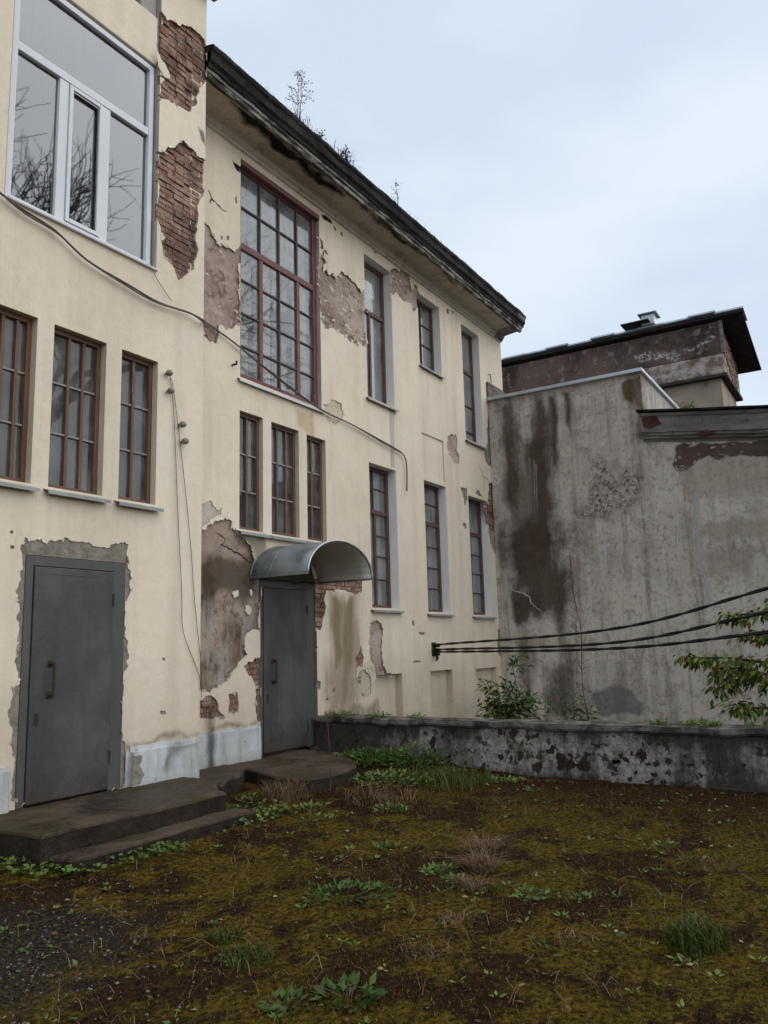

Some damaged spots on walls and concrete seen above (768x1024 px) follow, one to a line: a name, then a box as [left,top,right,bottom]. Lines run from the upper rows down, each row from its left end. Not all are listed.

spalling [155,13,207,112]
spalling [155,140,243,343]
peeling [316,236,369,347]
peeling [389,268,419,311]
spalling [634,333,739,389]
peeling [323,400,343,425]
peeling [447,434,459,464]
peeling [673,430,768,471]
water stain [503,393,571,624]
peeling [200,500,262,721]
spalling [314,579,361,632]
peeling [355,617,392,696]